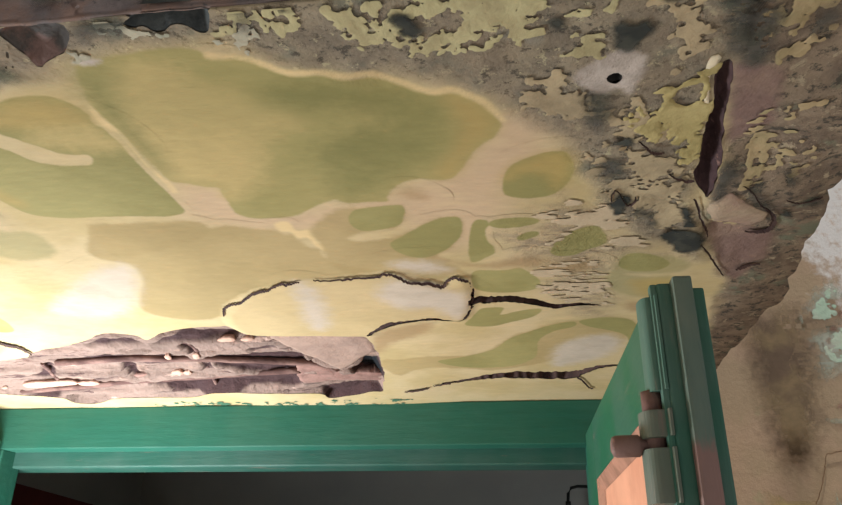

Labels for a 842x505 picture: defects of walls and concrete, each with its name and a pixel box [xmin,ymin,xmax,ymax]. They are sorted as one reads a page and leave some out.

spalling [0,23,91,69]
spalling [93,7,301,56]
damp [388,14,421,37]
peeling [319,0,551,58]
peeling [519,69,595,121]
spalling [531,0,841,284]
damp [0,21,705,378]
crack [222,273,600,319]
crack [0,343,32,356]
spalling [0,326,413,407]
crack [368,318,442,335]
crack [406,364,618,393]